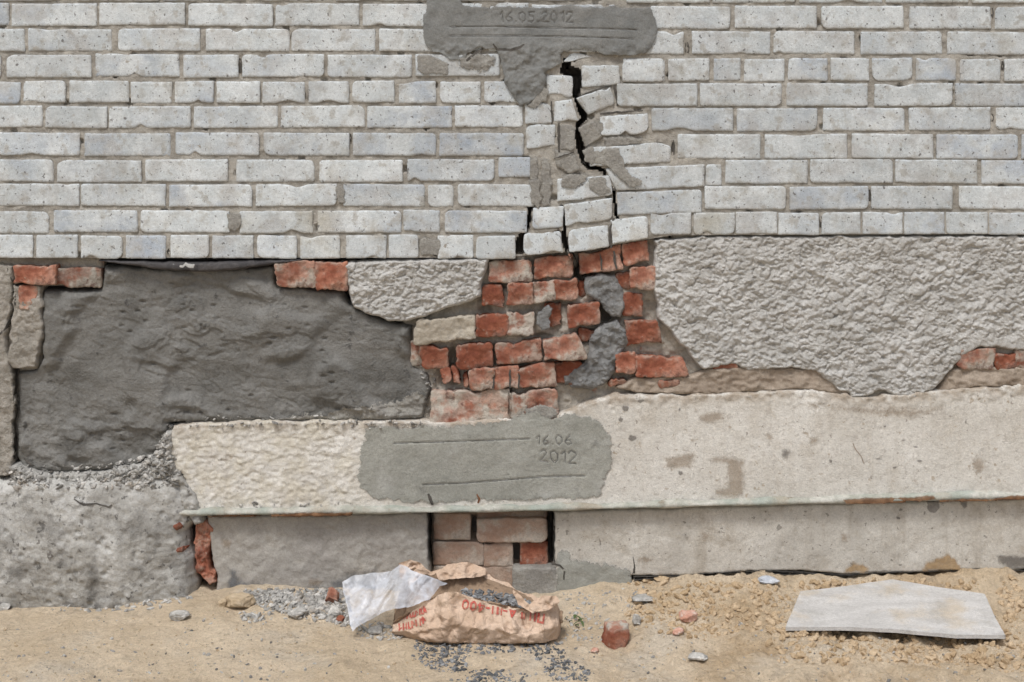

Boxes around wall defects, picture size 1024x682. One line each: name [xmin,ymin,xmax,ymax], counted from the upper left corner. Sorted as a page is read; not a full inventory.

crack [515,206,534,253]
crack [550,58,647,281]